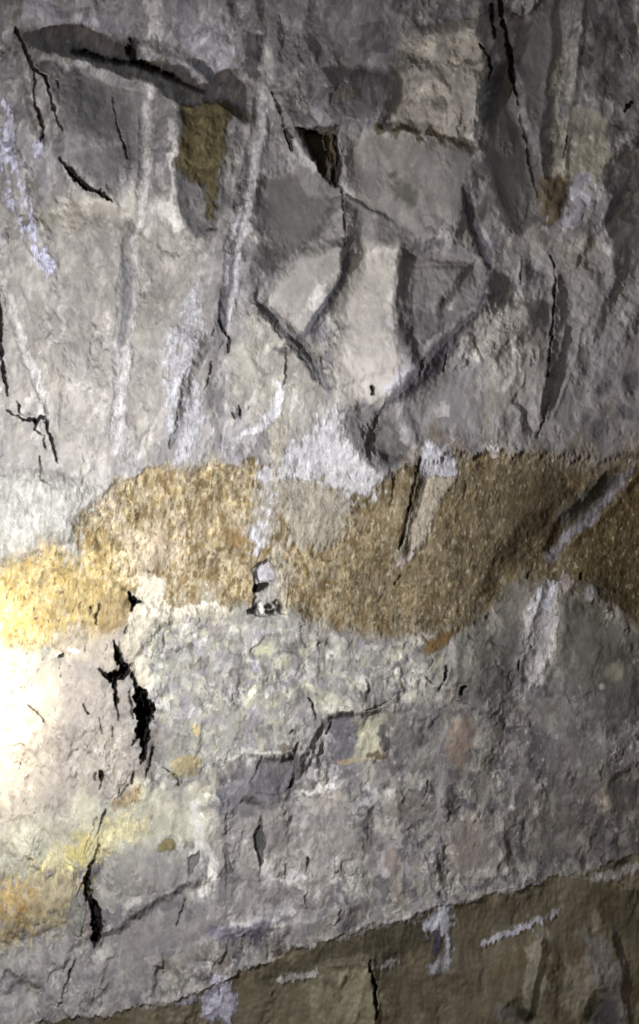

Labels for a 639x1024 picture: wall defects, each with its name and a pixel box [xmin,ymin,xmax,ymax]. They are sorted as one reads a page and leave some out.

crack [14,26,113,203]
spalling [298,125,342,188]
crack [479,0,538,197]
crack [547,255,557,377]
crack [0,304,57,481]
leakage [0,464,103,566]
leakage [237,379,387,614]
leakage [420,441,458,480]
leakage [122,606,235,670]
leakage [527,571,574,685]
crack [61,592,179,999]
crack [366,960,379,1020]